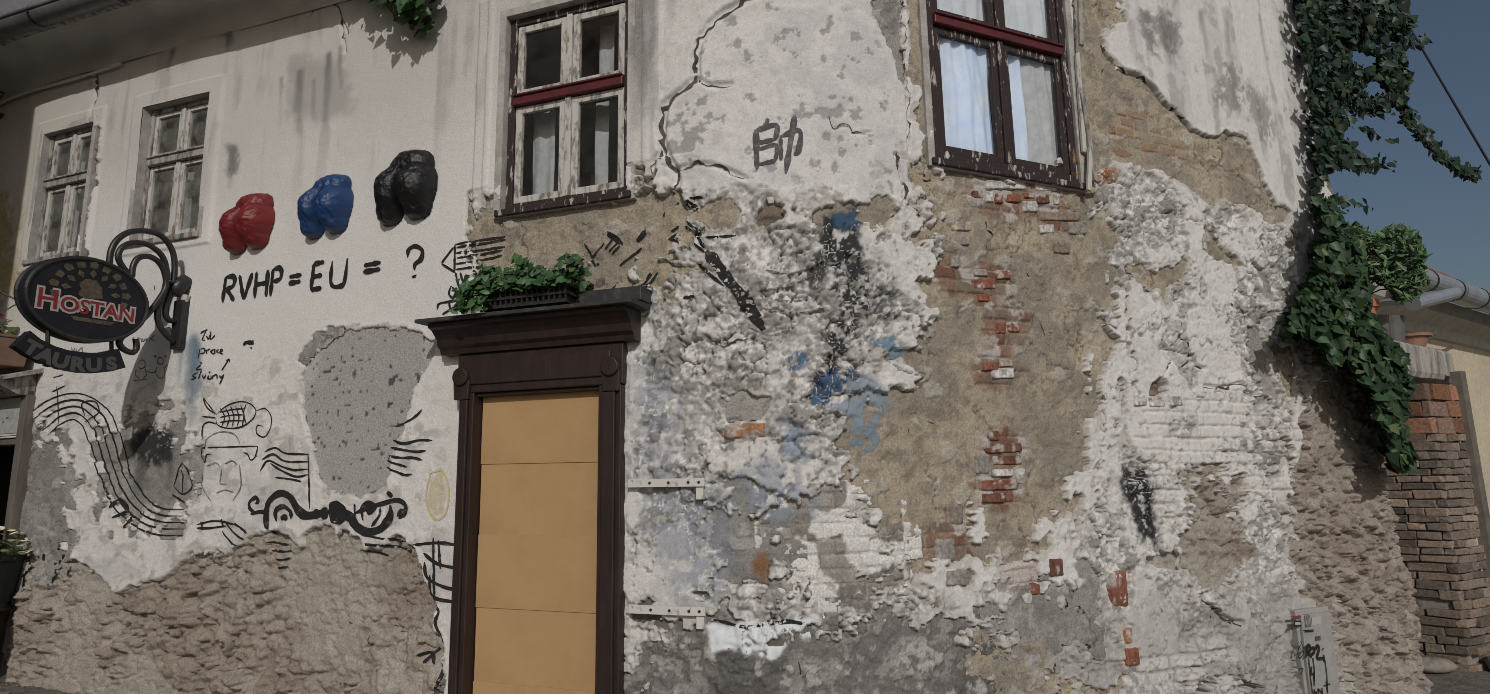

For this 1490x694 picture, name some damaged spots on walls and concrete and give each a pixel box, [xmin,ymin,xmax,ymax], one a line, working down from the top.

crack [650,0,747,194]
crack [872,0,920,217]
spalling [466,156,784,303]
spalling [298,323,437,498]
spalling [624,0,1295,694]
spalling [5,401,446,694]